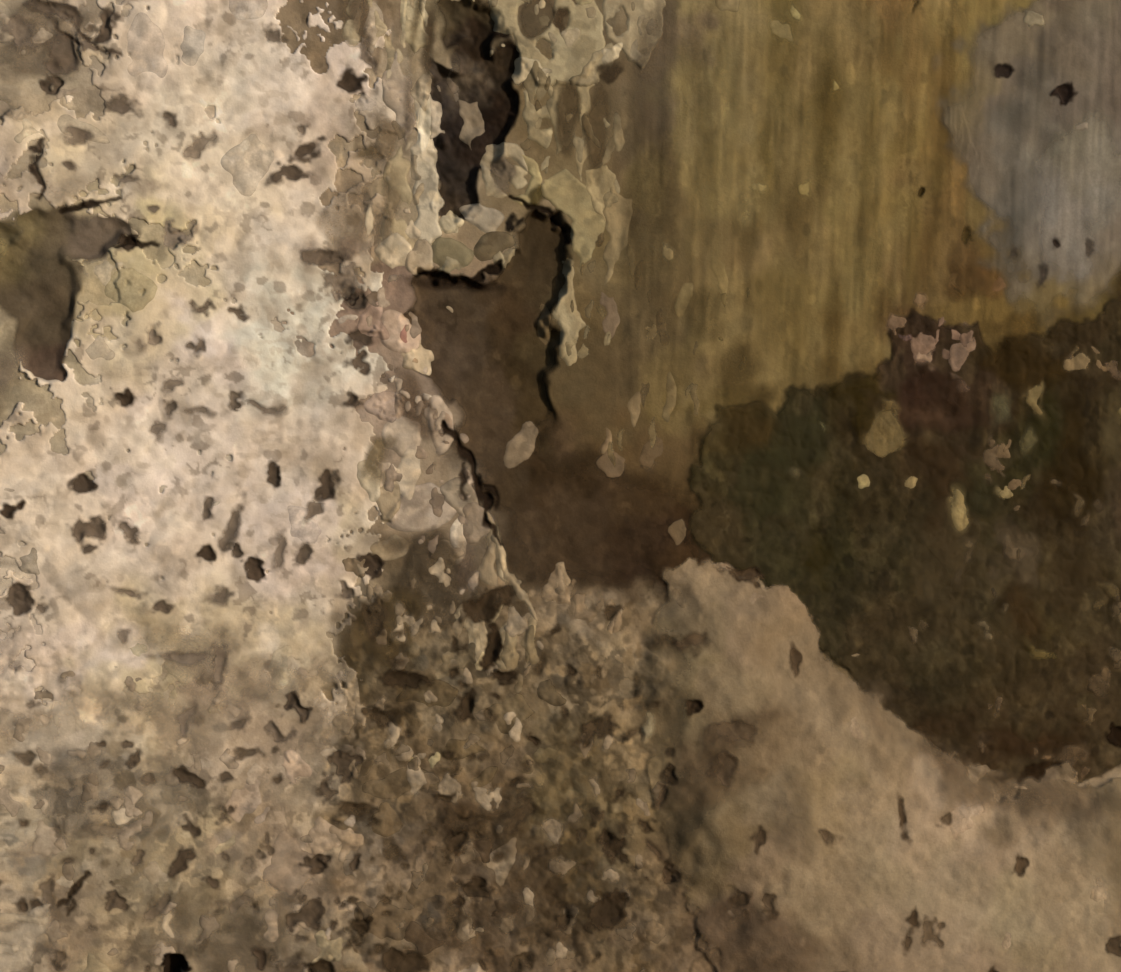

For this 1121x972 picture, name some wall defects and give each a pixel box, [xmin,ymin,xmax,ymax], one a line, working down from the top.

leakage [769,5,801,42]
peeling [887,314,976,394]
peeling [1063,346,1121,380]
peeling [0,0,705,972]
peeling [857,474,870,489]
peeling [863,398,906,457]
peeling [904,476,918,489]
peeling [983,383,1044,511]
leakage [688,274,1121,786]
peeling [951,488,974,585]
peeling [1081,646,1121,725]
peeling [1033,745,1090,780]